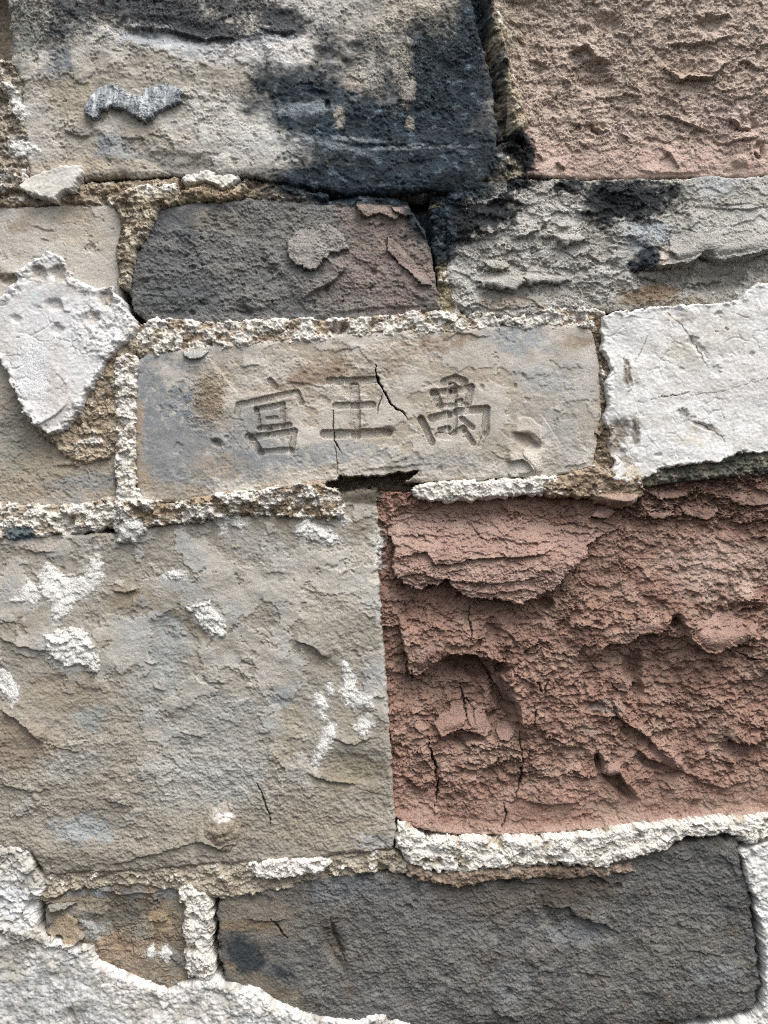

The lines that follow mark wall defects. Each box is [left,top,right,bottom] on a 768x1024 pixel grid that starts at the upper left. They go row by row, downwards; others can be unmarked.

leakage [390,18,415,129]
leakage [271,102,442,154]
leakage [312,172,484,267]
crack [375,364,406,416]
crack [332,410,340,468]
spalling [725,486,768,507]
spalling [388,486,718,605]
spalling [629,611,759,655]
spalling [432,669,521,741]
crack [428,737,438,802]
crack [501,679,548,826]
spalling [597,757,622,776]